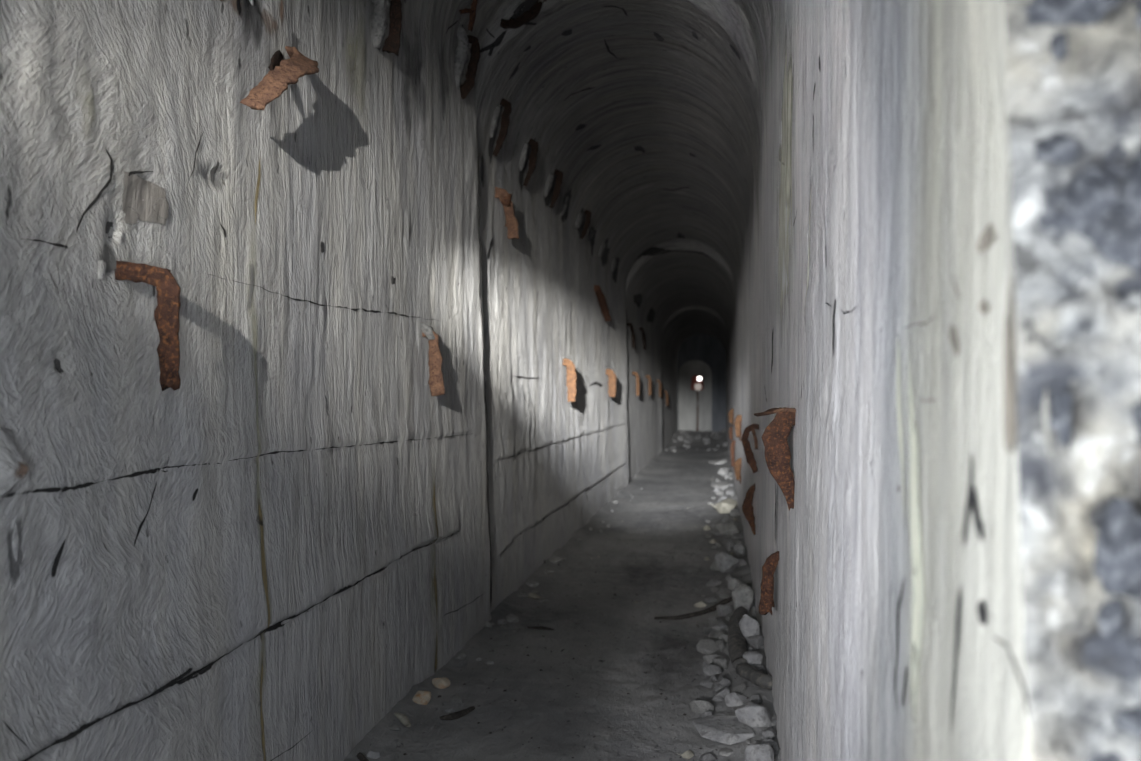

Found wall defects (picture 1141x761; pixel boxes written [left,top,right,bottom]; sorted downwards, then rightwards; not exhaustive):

crack [6,434,467,546]
crack [963,453,983,544]
crack [3,531,459,761]
crack [950,588,1029,735]